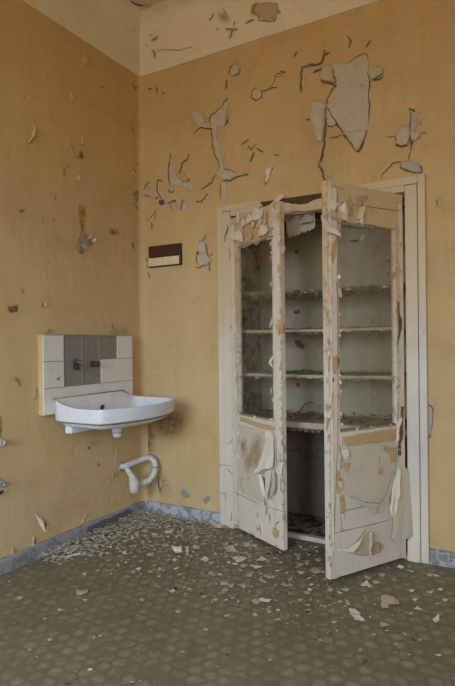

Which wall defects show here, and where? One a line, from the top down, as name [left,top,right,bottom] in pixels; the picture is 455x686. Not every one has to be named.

peeling [246,2,281,23]
peeling [133,99,247,211]
peeling [300,51,382,181]
peeling [381,109,427,177]
peeling [195,233,213,271]